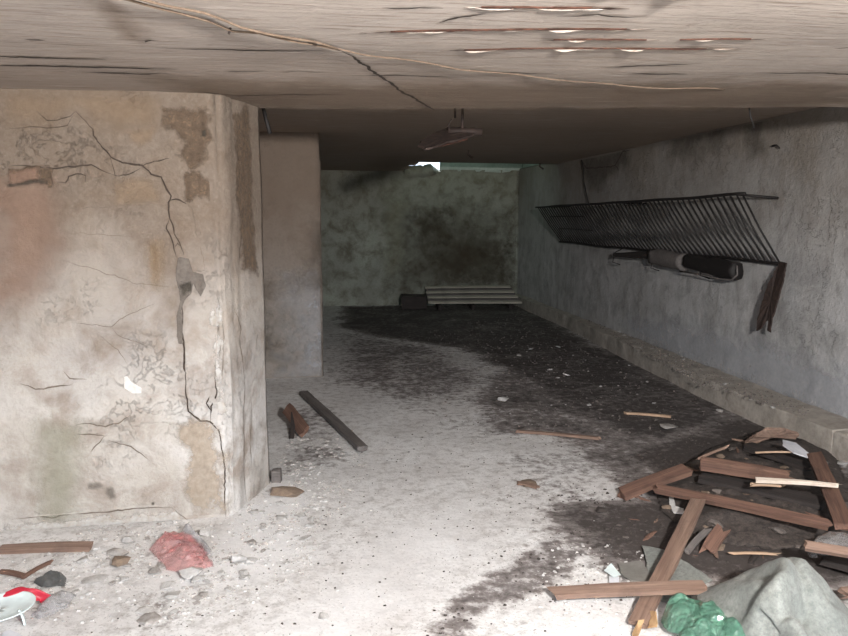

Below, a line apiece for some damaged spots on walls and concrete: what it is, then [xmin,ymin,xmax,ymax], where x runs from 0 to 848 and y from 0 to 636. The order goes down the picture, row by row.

crack [0,39,167,75]
crack [145,40,255,51]
crack [342,51,457,110]
crack [389,7,483,23]
crack [557,12,643,20]
crack [9,109,187,255]
peeling [162,108,212,202]
crack [64,260,168,360]
spalling [175,256,209,347]
crack [19,372,75,393]
crack [182,290,252,517]
crack [77,416,146,458]